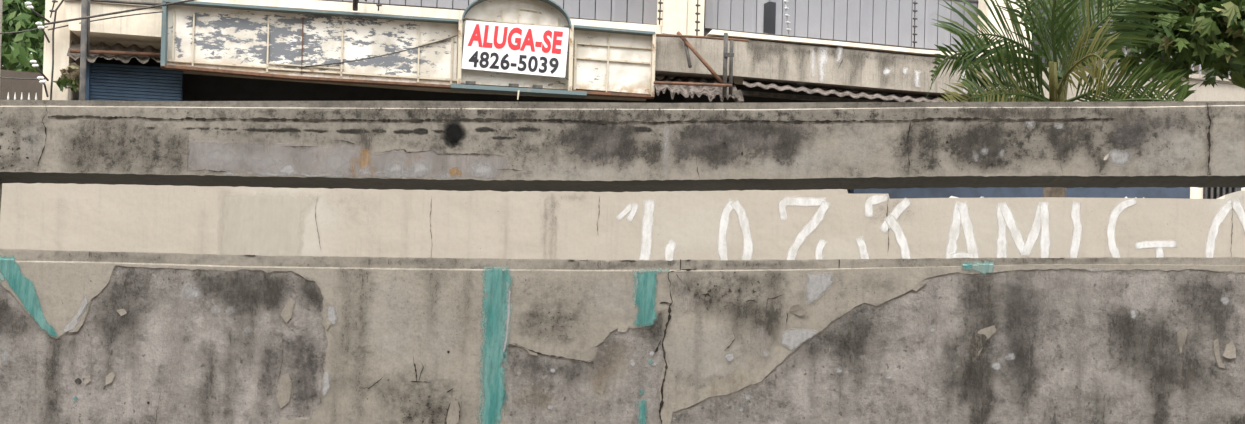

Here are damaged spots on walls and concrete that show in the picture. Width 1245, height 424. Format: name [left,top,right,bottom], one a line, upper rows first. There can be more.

damp [170,105,463,178]
damp [475,107,808,170]
damp [222,194,311,257]
flaking render [0,265,336,424]
damp [172,269,282,346]
crack [654,269,788,424]
flaking render [501,268,1245,424]
damp [928,280,1055,424]
damp [1109,310,1213,424]